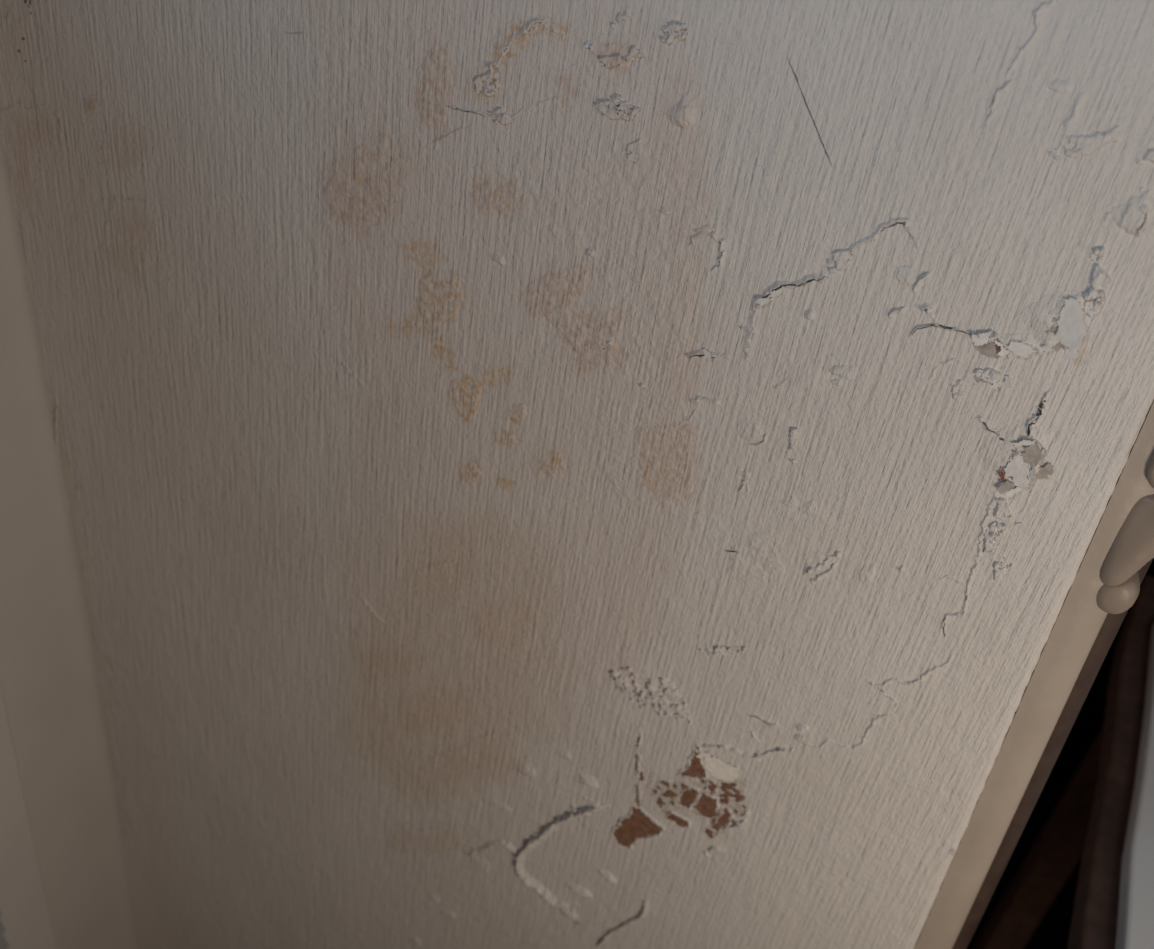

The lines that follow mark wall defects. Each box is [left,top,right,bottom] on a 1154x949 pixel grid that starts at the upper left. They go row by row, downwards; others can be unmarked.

peeling [594,93,641,120]
crack [737,217,912,364]
crack [909,323,972,340]
peeling [970,246,1110,390]
damp [282,0,771,821]
crack [973,389,1051,441]
peeling [977,422,1054,579]
crack [803,486,999,750]
peeling [609,666,693,724]
flaking render [609,712,808,857]
peeling [463,795,611,925]